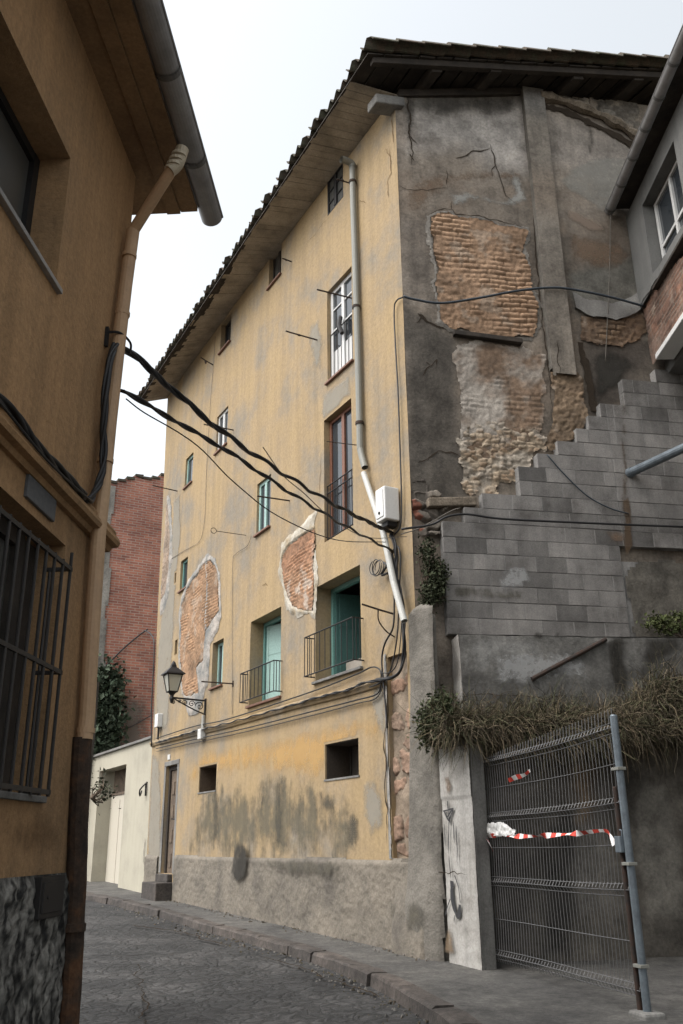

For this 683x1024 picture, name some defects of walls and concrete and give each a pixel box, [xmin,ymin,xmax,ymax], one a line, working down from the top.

crack [361,100,597,433]
flaking render [412,211,588,536]
spalling [573,292,647,347]
flaking render [178,553,221,716]
flaking render [278,511,318,619]
damp [196,779,357,881]
spalling [383,653,410,859]